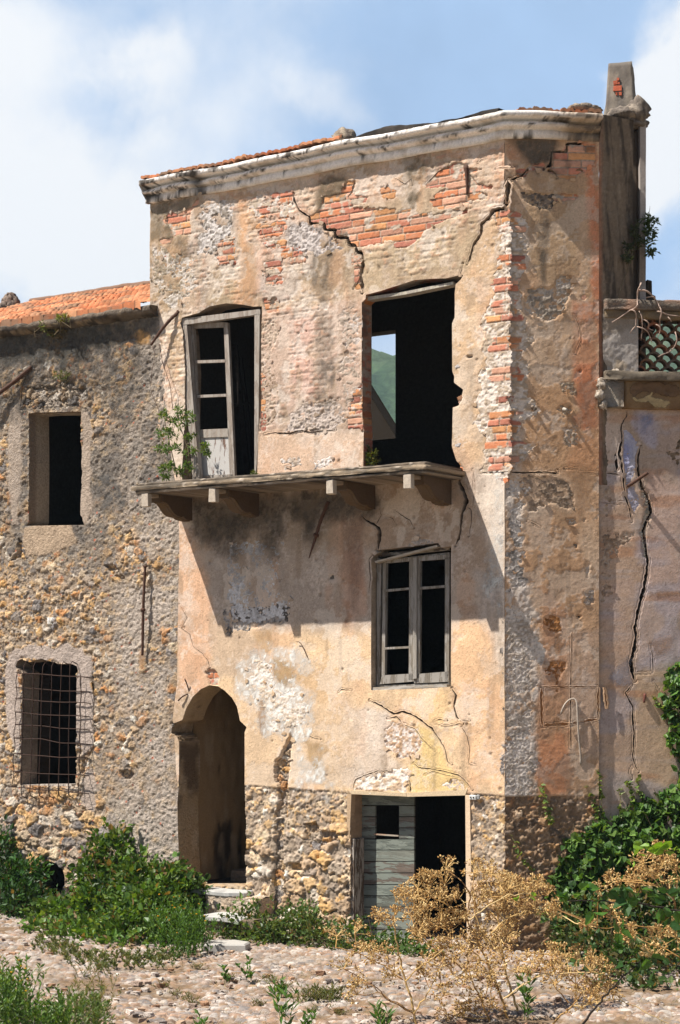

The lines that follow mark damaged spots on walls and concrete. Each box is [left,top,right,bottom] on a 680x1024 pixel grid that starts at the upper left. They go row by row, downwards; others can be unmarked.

crack [292,193,366,293]
crack [393,162,449,185]
crack [459,141,584,277]
spalling [516,140,595,182]
spalling [149,163,493,435]
spalling [457,210,586,592]
flaking render [223,537,293,636]
crack [361,508,414,593]
crack [454,411,660,779]
flaking render [243,655,309,742]
flaking render [354,722,422,793]
crack [338,688,477,793]